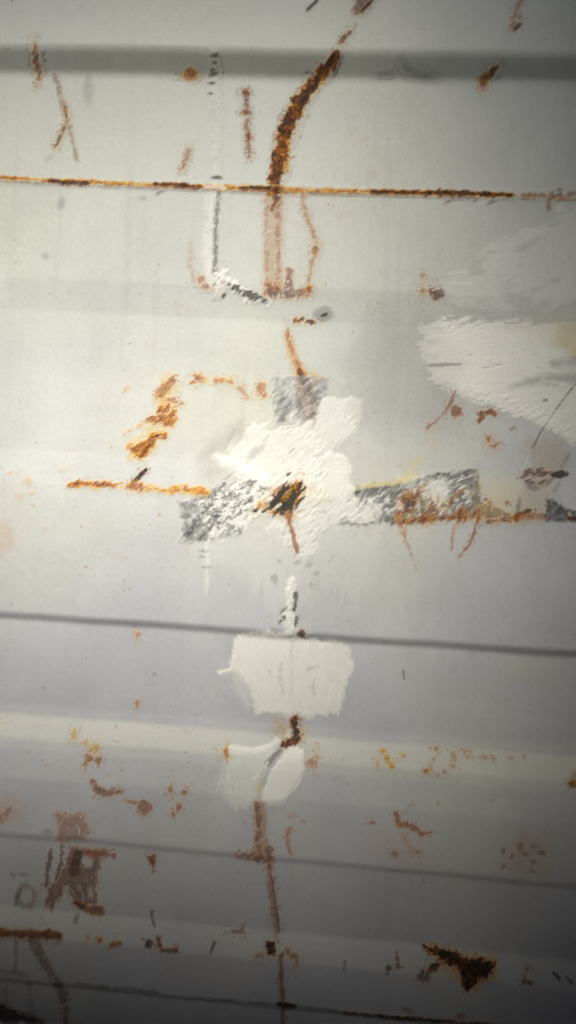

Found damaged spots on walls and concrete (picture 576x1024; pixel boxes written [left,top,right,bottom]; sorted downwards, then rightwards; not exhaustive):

rust [25,31,48,92]
rust [472,55,505,100]
rust [234,0,379,304]
rust [51,367,273,501]
rust [391,405,576,573]
rust [268,709,324,778]
rust [0,720,193,959]
rust [0,928,75,1024]
rust [221,797,310,1024]
rust [382,938,503,998]